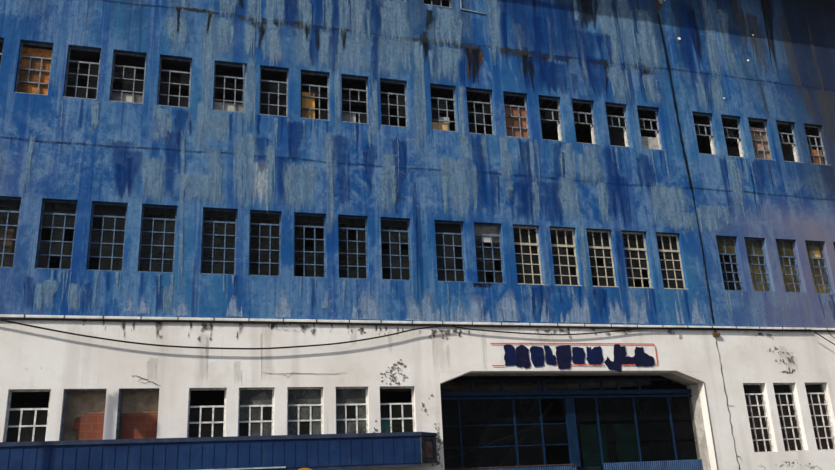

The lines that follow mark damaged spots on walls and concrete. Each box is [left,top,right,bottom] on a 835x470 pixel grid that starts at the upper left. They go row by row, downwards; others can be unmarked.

leakage [160,0,222,199]
leakage [246,117,311,210]
leakage [234,0,481,156]
leakage [488,0,659,99]
peeling [380,359,408,385]
crack [703,261,740,470]